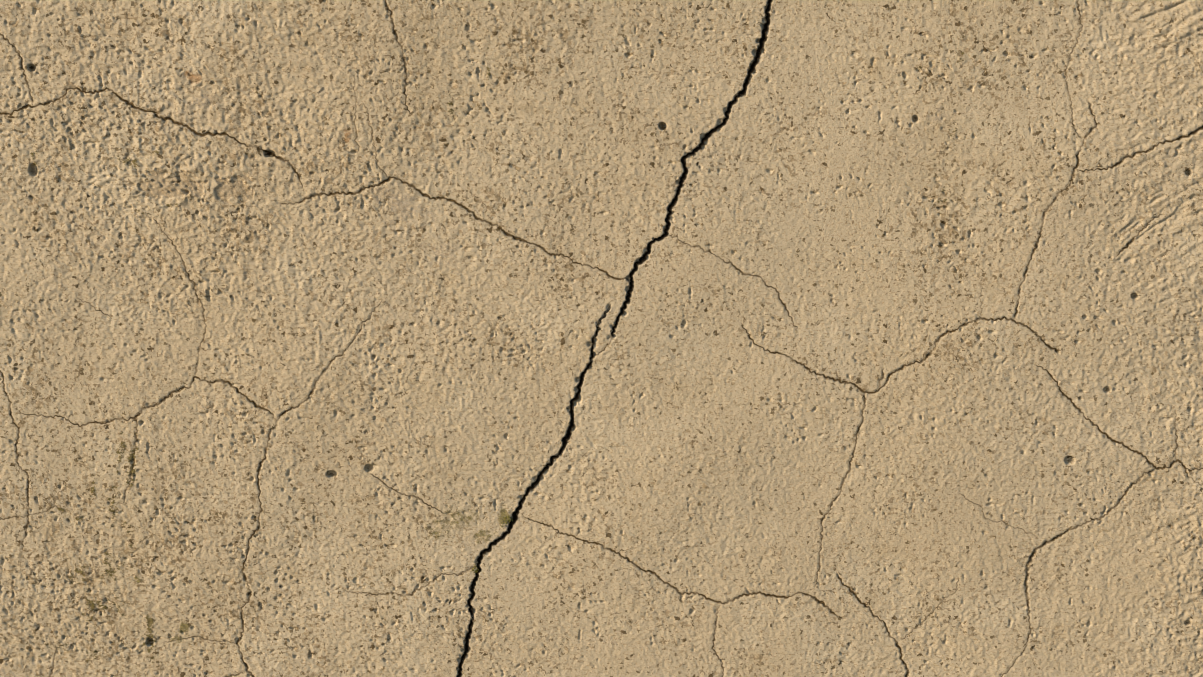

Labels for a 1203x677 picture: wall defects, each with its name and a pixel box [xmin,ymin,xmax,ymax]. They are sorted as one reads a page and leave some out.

crack [1065,3,1083,90]
crack [0,0,841,677]
crack [742,103,1203,584]
crack [838,576,909,677]
crack [1001,365,1203,677]